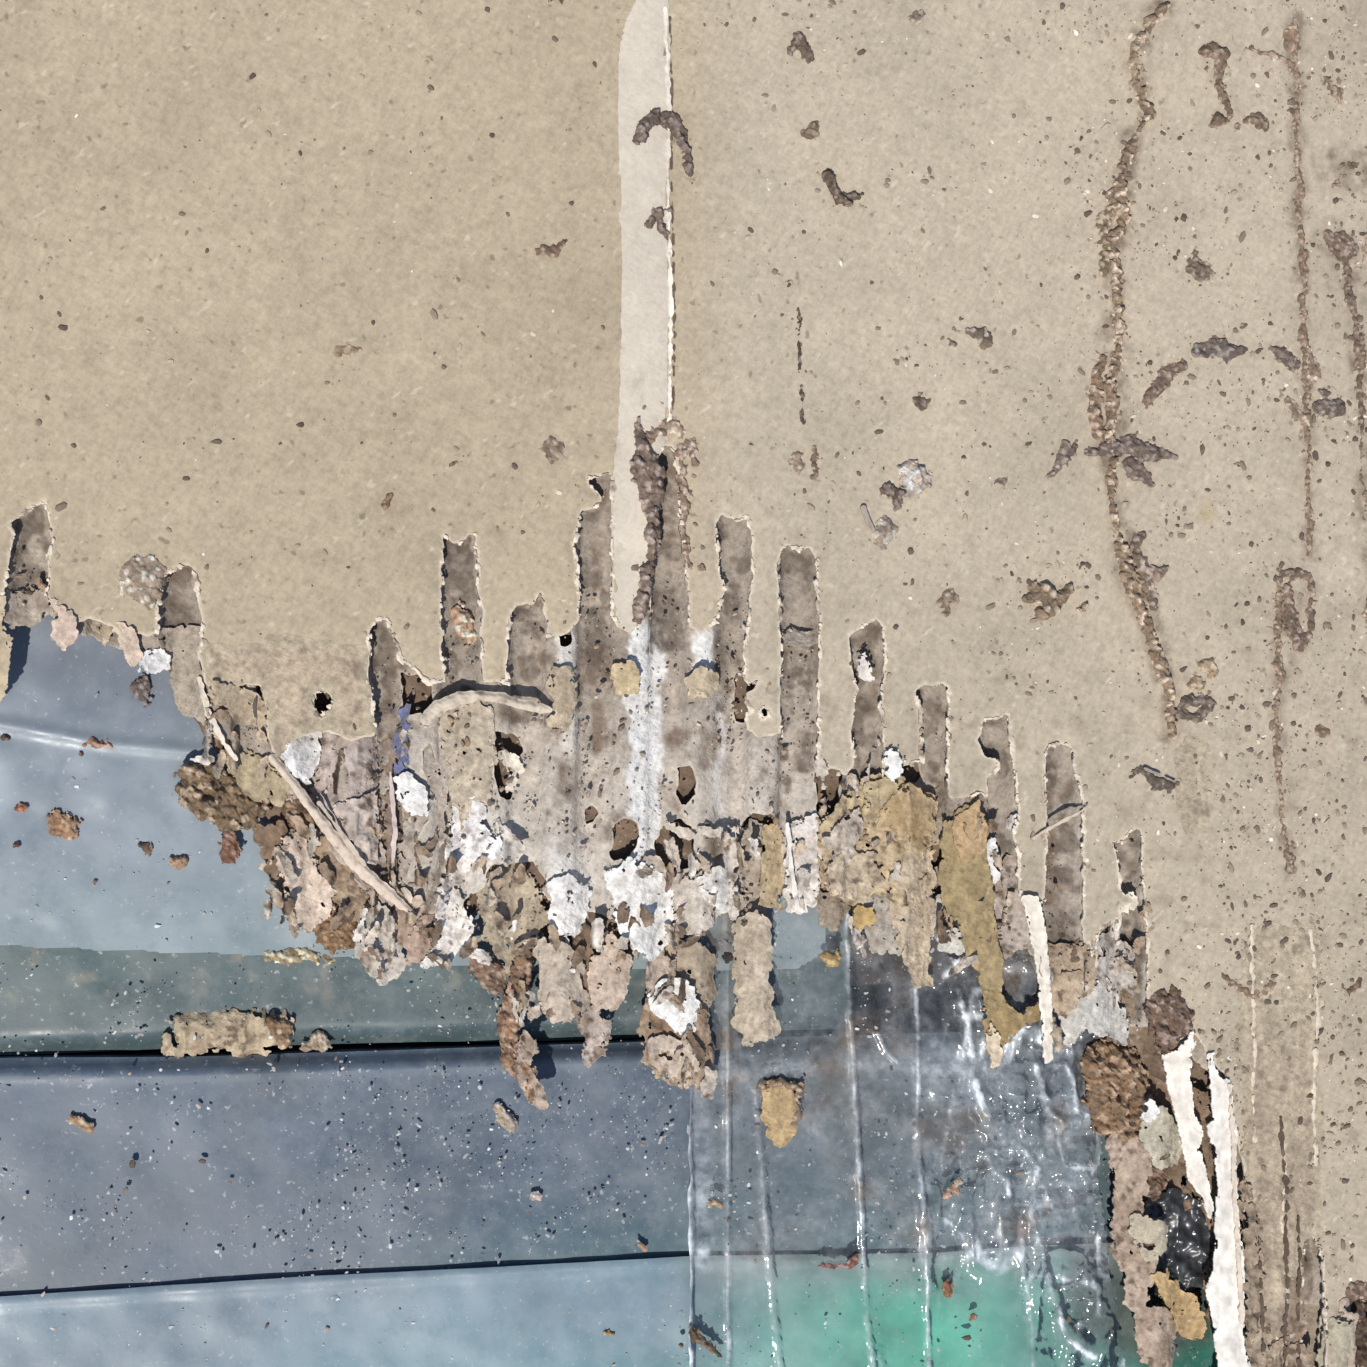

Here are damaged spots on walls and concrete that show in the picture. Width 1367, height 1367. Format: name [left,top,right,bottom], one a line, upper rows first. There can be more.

peeling [787,445,823,481]
spalling [0,589,1367,1367]